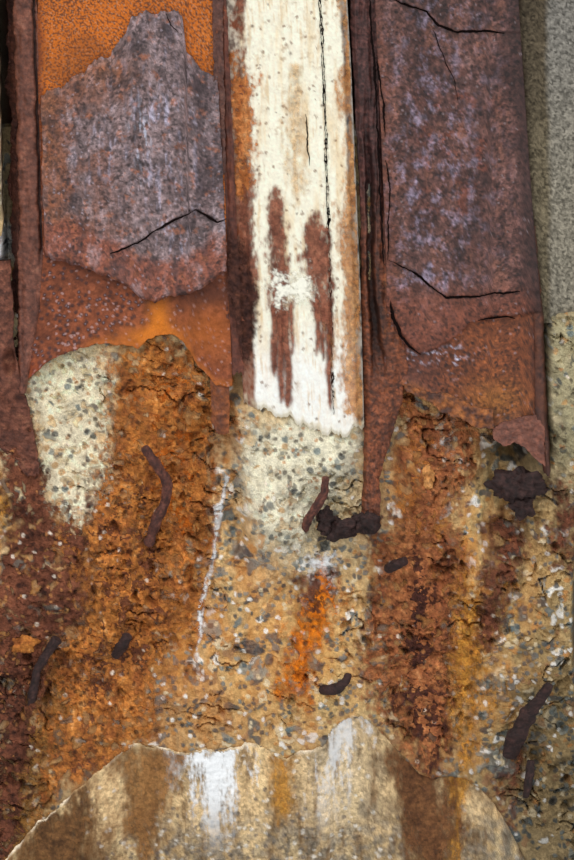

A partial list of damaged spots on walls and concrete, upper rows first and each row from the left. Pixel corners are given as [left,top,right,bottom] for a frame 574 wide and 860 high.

crack [110,209,226,254]
rust [40,0,363,424]
crack [305,0,332,297]
crack [369,0,520,299]
spalling [26,348,113,526]
spalling [239,417,362,557]
crack [390,300,421,355]
spalling [547,316,574,467]
rust [0,335,244,860]
rust [273,570,337,704]
spalling [319,673,352,695]
rust [358,384,546,860]